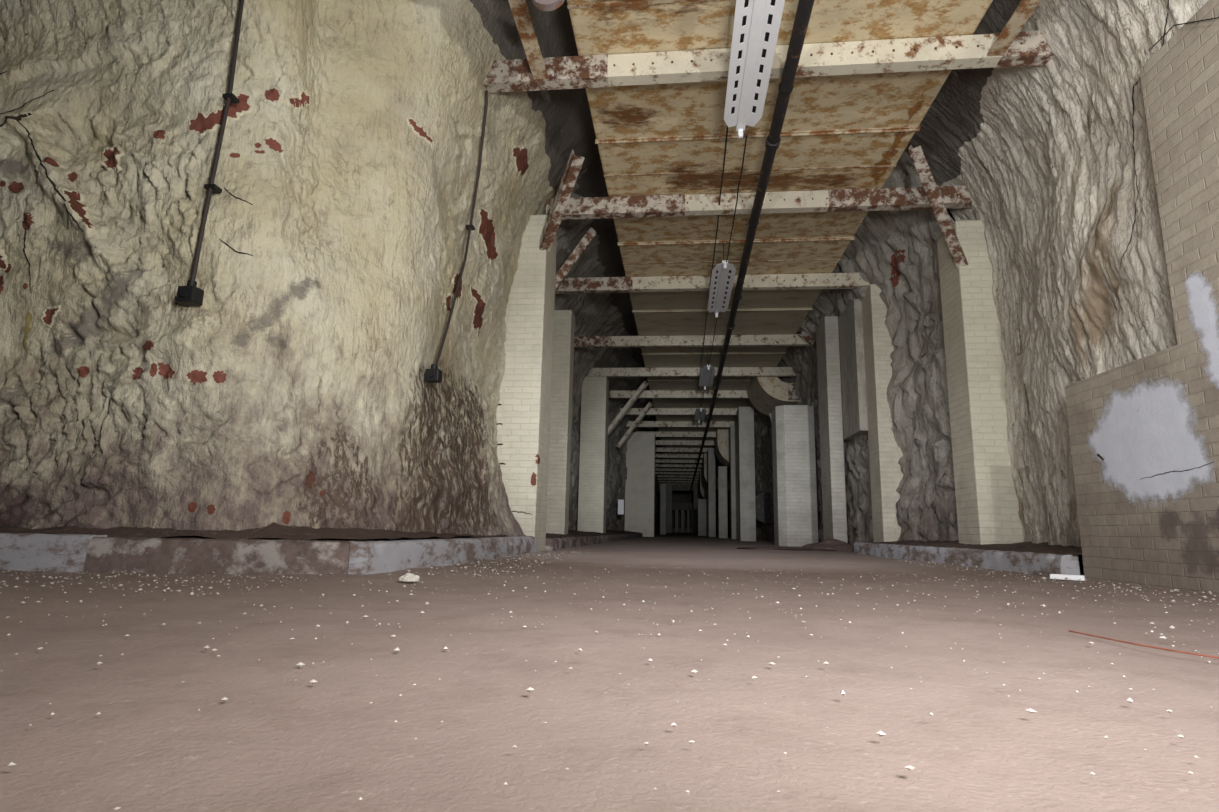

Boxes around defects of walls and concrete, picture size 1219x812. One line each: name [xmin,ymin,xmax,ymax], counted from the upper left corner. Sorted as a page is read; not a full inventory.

rust [598,0,708,20]
crack [0,90,83,232]
rust [601,105,654,128]
rust [667,165,855,192]
rust [870,101,923,180]
crack [23,220,32,294]
water stain [298,358,499,540]
water stain [1160,512,1219,573]